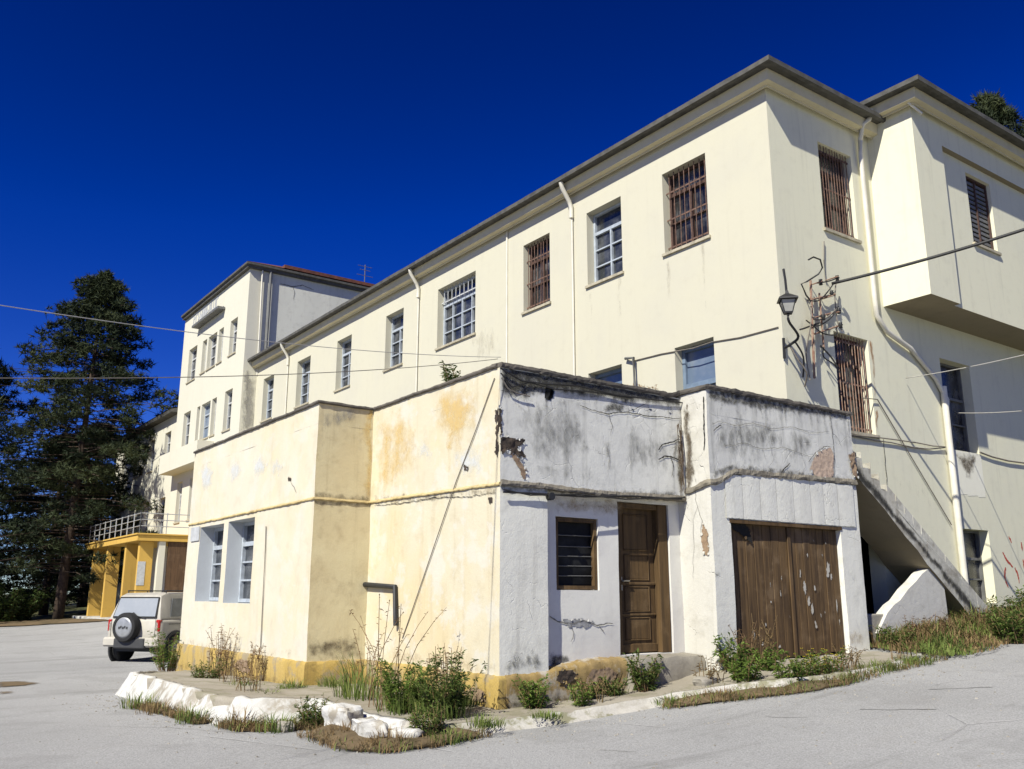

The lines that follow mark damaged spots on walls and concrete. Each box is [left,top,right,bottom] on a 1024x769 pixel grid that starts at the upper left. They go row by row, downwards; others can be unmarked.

spalling [494,405,528,480]
damp [503,368,693,500]
crack [580,397,840,477]
spalling [810,448,834,478]
peeling [700,523,709,556]
crack [550,616,613,641]